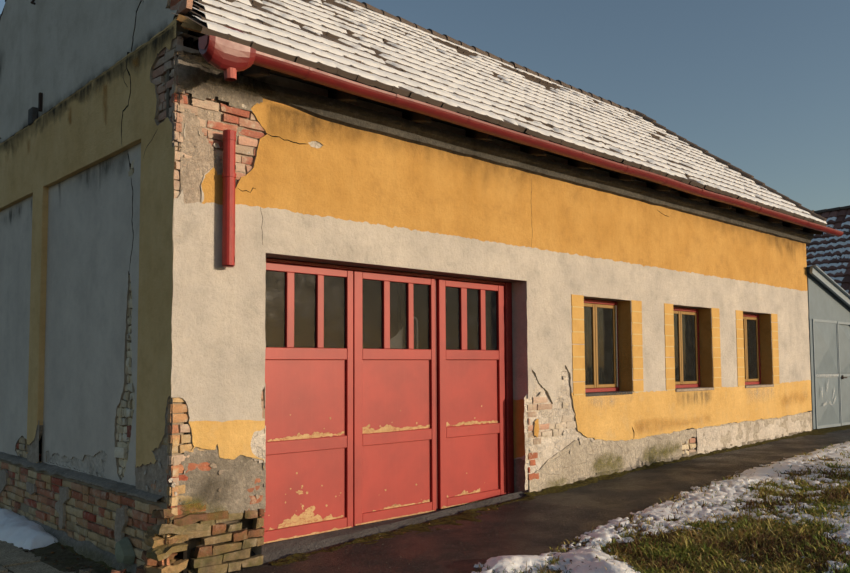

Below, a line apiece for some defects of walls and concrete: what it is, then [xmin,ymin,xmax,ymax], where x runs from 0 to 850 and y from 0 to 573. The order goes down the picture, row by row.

flaking render [169,0,193,16]
water stain [36,27,173,126]
crack [121,1,155,275]
flaking render [152,36,265,204]
peeling [116,275,344,516]
peeling [363,422,430,434]
peeling [446,417,498,427]
flaking render [524,366,595,490]
peeling [264,482,485,544]